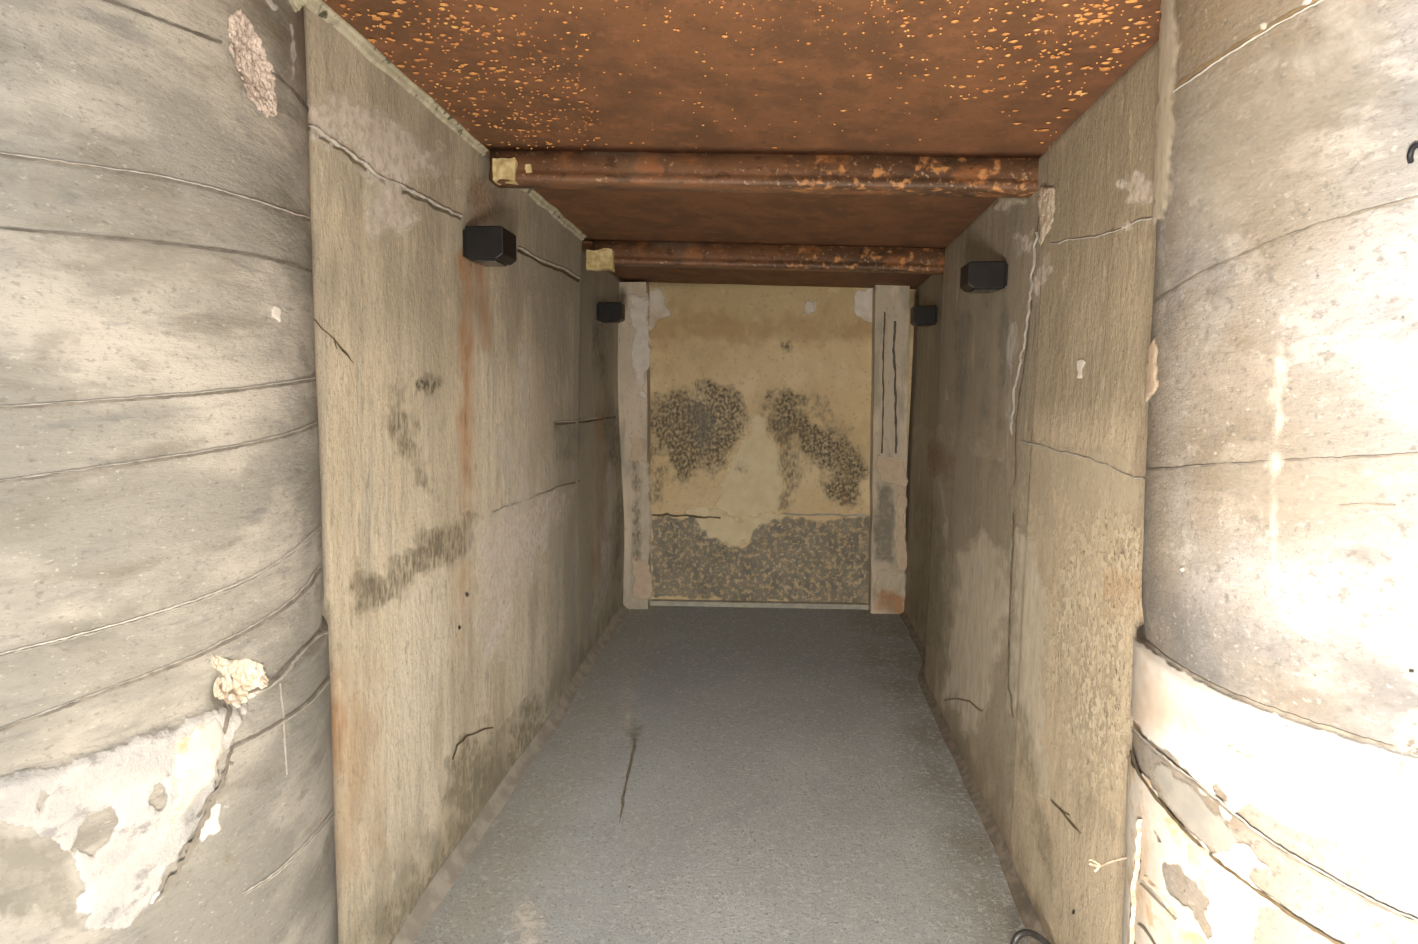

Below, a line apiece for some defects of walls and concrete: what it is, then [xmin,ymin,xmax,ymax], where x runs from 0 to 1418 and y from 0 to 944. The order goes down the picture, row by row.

spalling [228,9,278,117]
corrosion [325,0,656,150]
corrosion [709,0,783,63]
corrosion [797,0,1161,144]
damp [350,428,566,656]
damp [596,380,894,611]
peeling [0,654,269,930]
crack [620,738,636,818]
peeling [1122,637,1418,944]